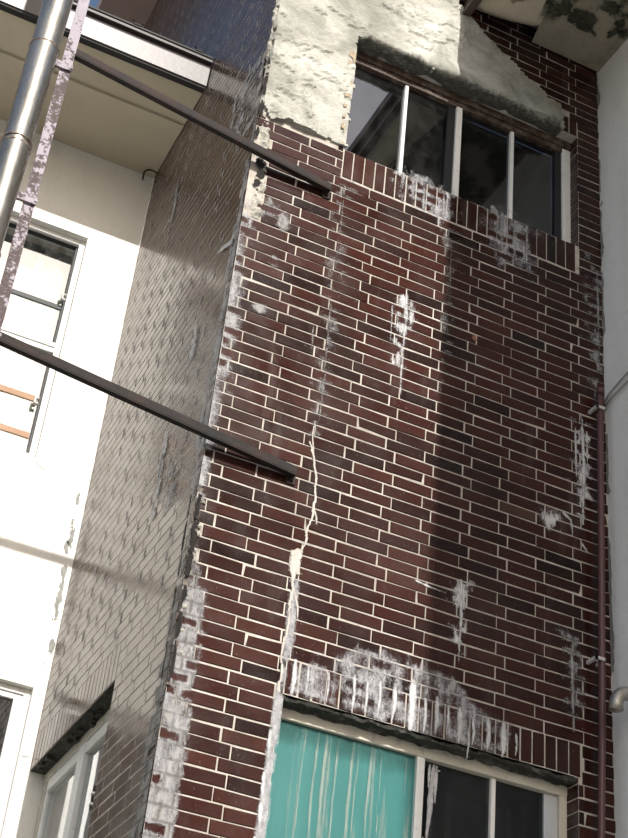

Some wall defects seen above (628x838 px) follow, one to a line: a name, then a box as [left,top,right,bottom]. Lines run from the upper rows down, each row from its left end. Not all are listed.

spalling [256,0,565,149]
spalling [249,154,268,220]
efflorescence [394,171,456,223]
efflorescence [488,206,532,271]
efflorescence [391,294,414,369]
efflorescence [542,420,592,531]
peeling [64,519,75,554]
crack [277,423,318,692]
peeling [48,564,68,655]
efflorescence [451,580,474,660]
efflorescence [559,629,585,731]
damp [254,646,518,838]